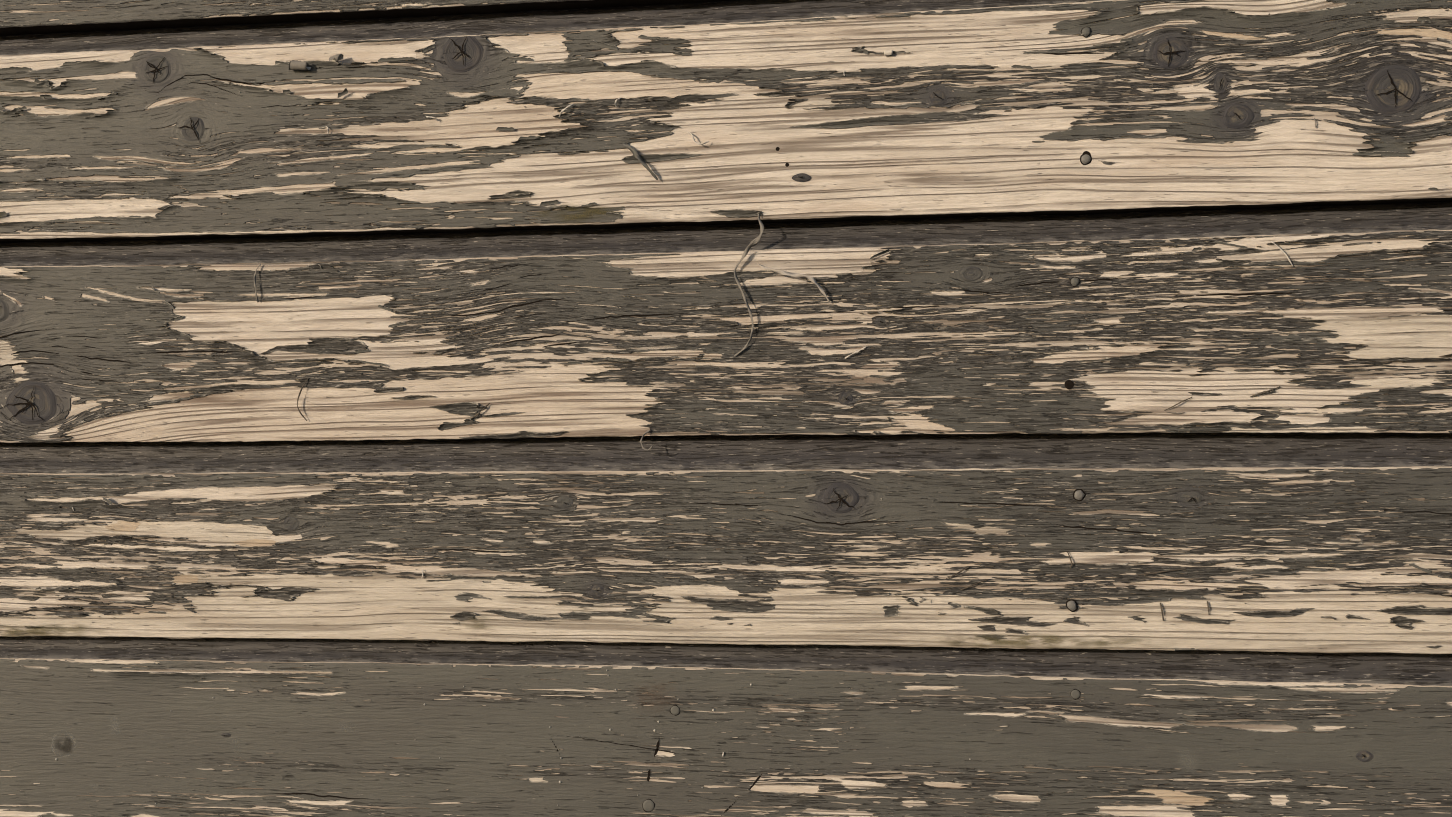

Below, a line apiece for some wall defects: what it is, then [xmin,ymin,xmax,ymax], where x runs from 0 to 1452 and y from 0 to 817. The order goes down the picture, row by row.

peeling [0,0,1452,239]
peeling [601,248,892,286]
peeling [1029,235,1432,277]
peeling [28,262,954,442]
peeling [1031,344,1452,433]
peeling [1207,287,1452,359]
peeling [0,485,1452,654]